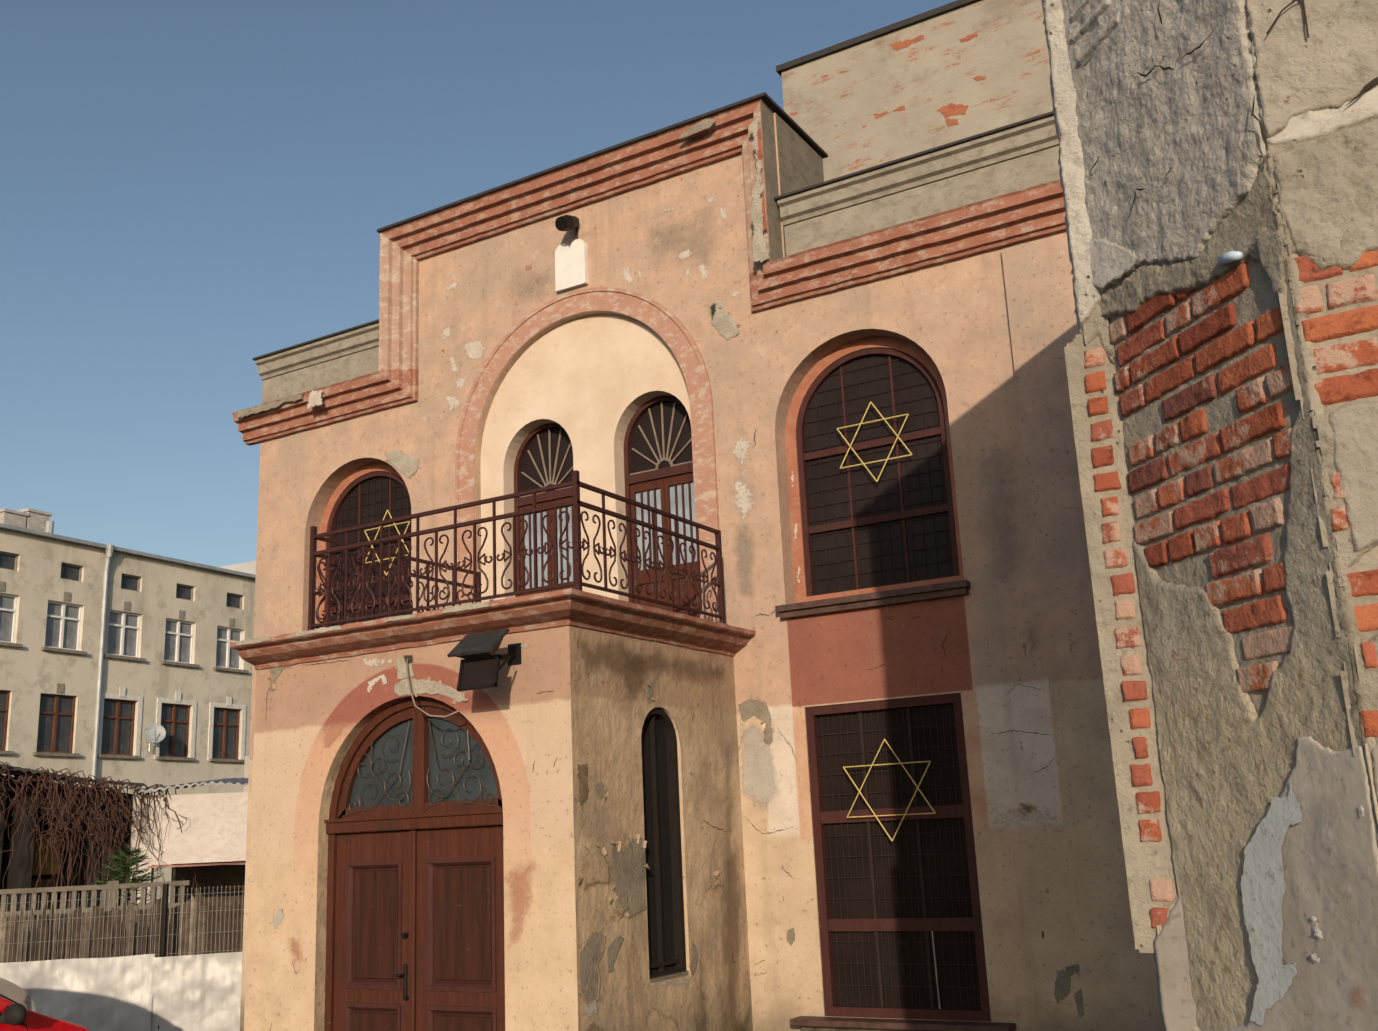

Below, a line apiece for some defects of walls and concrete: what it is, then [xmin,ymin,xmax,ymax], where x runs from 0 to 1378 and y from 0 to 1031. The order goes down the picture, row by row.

crack [1133,1,1216,77]
peeling [937,103,969,127]
crack [1251,94,1268,152]
crack [1126,165,1174,221]
flaking render [1089,238,1137,289]
flaking render [708,290,740,340]
flaking render [1064,250,1378,953]
flaking render [363,652,468,704]
flaking render [738,695,775,806]
flaking render [610,833,650,918]
peeling [1241,781,1323,1026]
flaking render [578,930,624,1031]